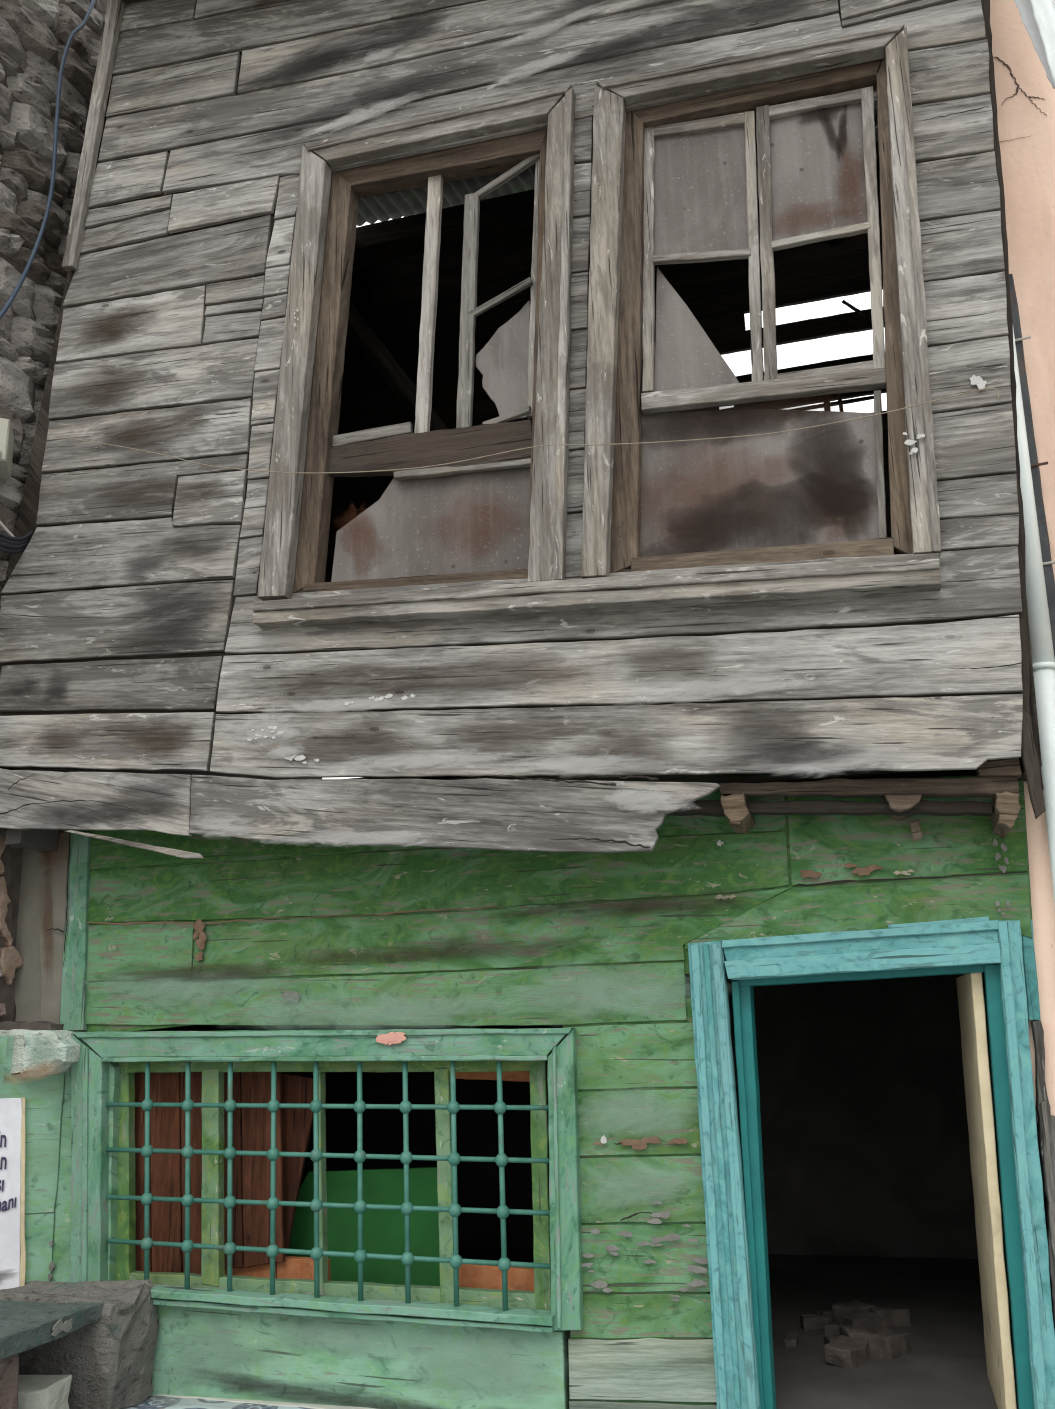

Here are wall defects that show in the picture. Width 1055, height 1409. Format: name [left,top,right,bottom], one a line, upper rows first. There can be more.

crack [924,57,1047,142]
crack [953,661,1024,669]
peeling [592,1135,689,1150]
peeling [581,1201,708,1302]